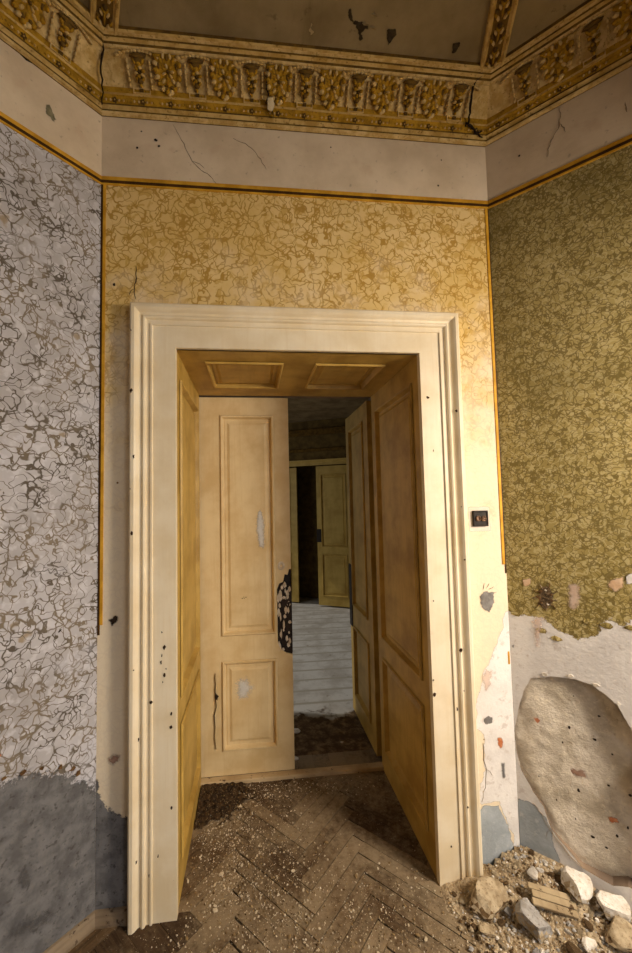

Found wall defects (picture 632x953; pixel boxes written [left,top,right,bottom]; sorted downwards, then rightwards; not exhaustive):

peeling [348,9,397,44]
crack [465,76,483,138]
peeling [608,574,632,591]
flaking render [476,578,632,911]
flaking render [0,763,137,953]